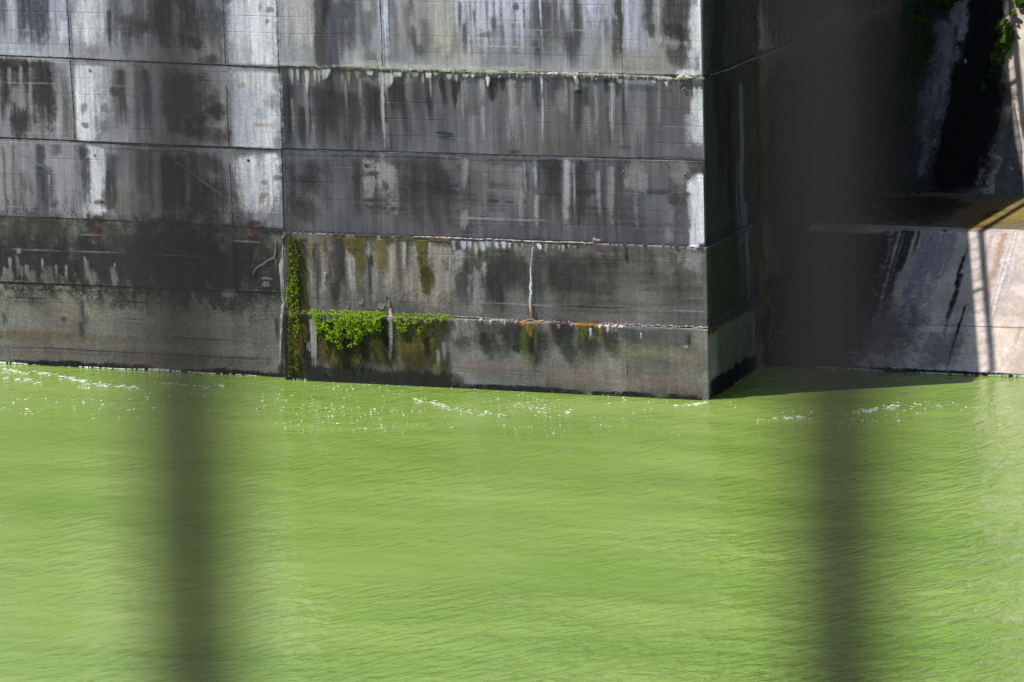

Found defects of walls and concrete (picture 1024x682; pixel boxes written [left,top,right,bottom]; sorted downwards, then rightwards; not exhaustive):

damp [9,0,127,48]
damp [0,57,138,335]
damp [218,0,795,399]
damp [879,229,1023,378]